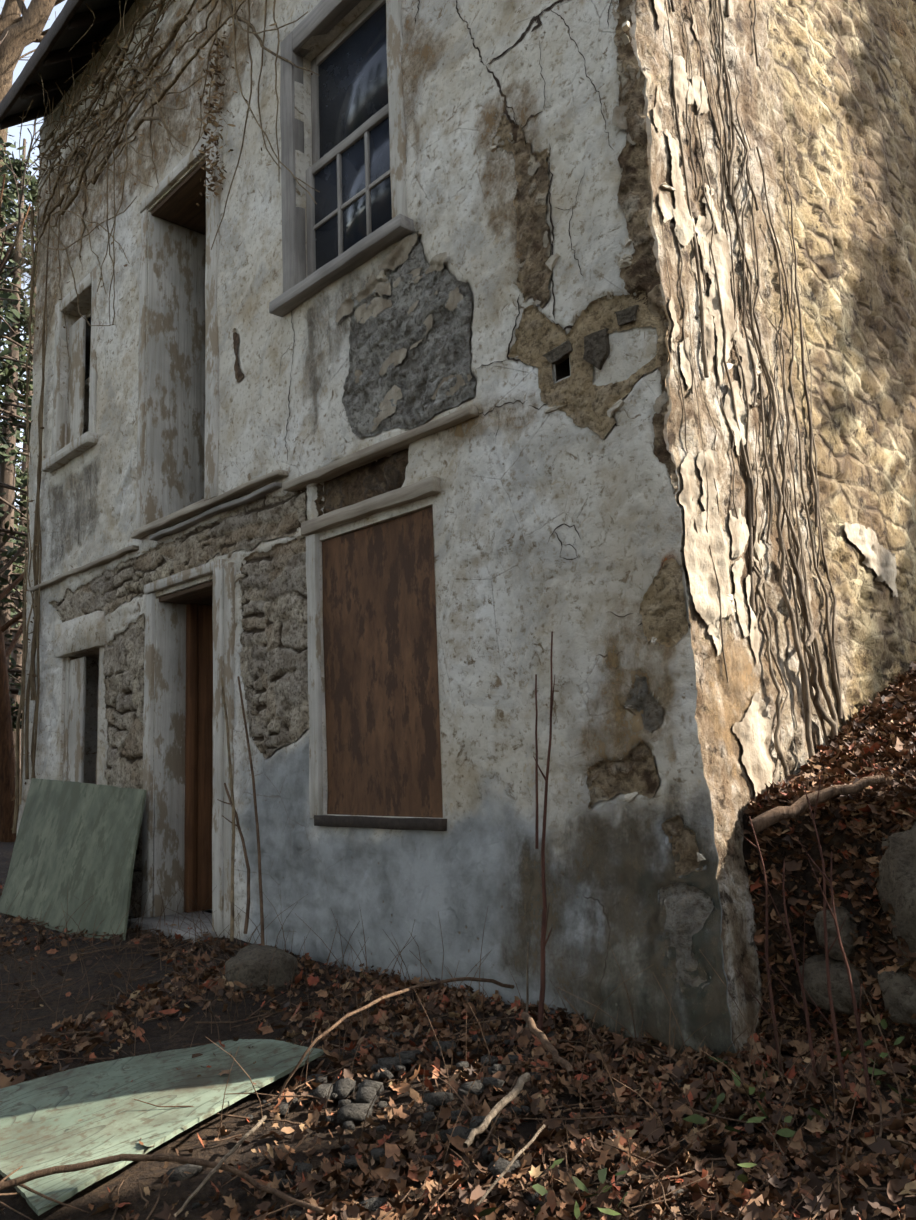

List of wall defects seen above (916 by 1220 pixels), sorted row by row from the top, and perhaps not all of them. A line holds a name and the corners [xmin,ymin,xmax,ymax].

crack [456,0,615,330]
flaking render [335,231,476,438]
flaking render [488,0,766,665]
flaking render [49,448,409,758]
flaking render [845,522,898,597]
flaking render [102,613,145,789]
flaking render [586,677,664,809]
flaking render [733,692,782,797]
flaking render [130,822,142,918]
flaking render [658,815,714,1002]